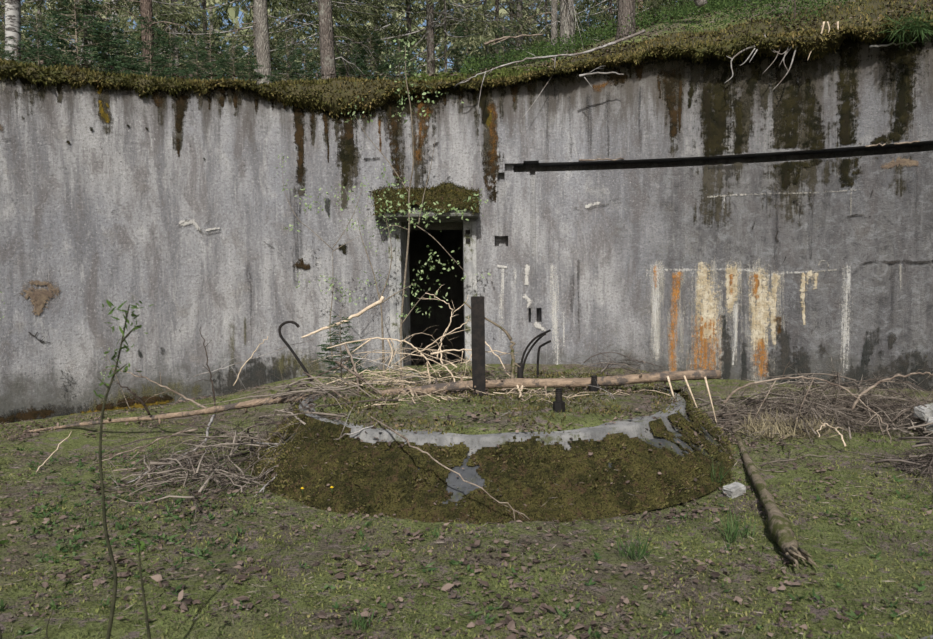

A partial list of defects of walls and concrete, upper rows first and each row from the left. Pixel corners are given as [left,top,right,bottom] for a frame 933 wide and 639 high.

rust [646,260,784,381]
damp [765,239,933,391]